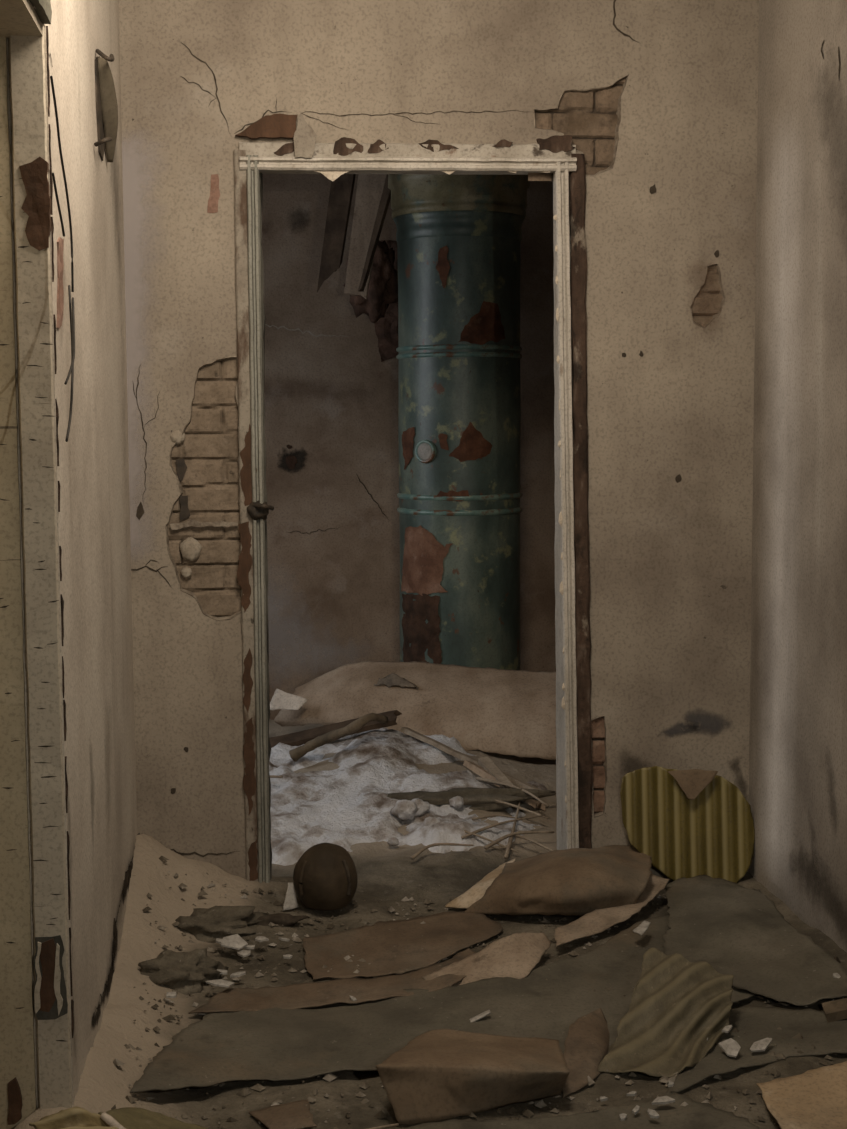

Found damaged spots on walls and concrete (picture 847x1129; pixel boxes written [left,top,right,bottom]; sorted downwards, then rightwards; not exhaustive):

crack [613,0,641,44]
crack [181,43,539,134]
spalling [533,74,629,177]
spalling [508,171,553,181]
peeling [19,157,64,329]
spalling [690,250,726,329]
spalling [165,356,257,621]
leakage [663,713,729,736]
crack [170,849,240,857]
crack [92,849,135,1027]